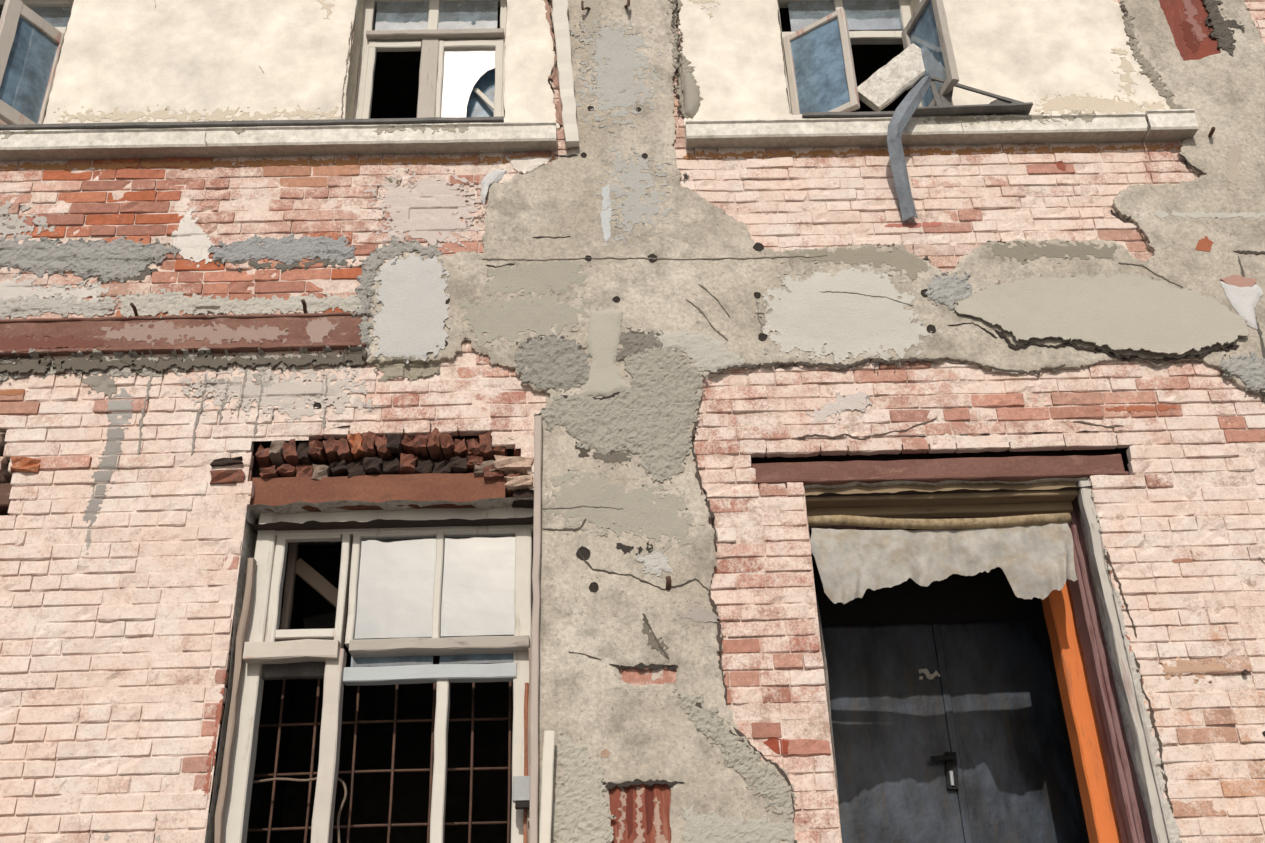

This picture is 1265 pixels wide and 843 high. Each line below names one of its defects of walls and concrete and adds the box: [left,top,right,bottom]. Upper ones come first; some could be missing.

spalling [666,0,703,119]
spalling [1202,0,1245,56]
spalling [514,327,711,483]
crack [691,421,717,552]
crack [542,505,795,812]